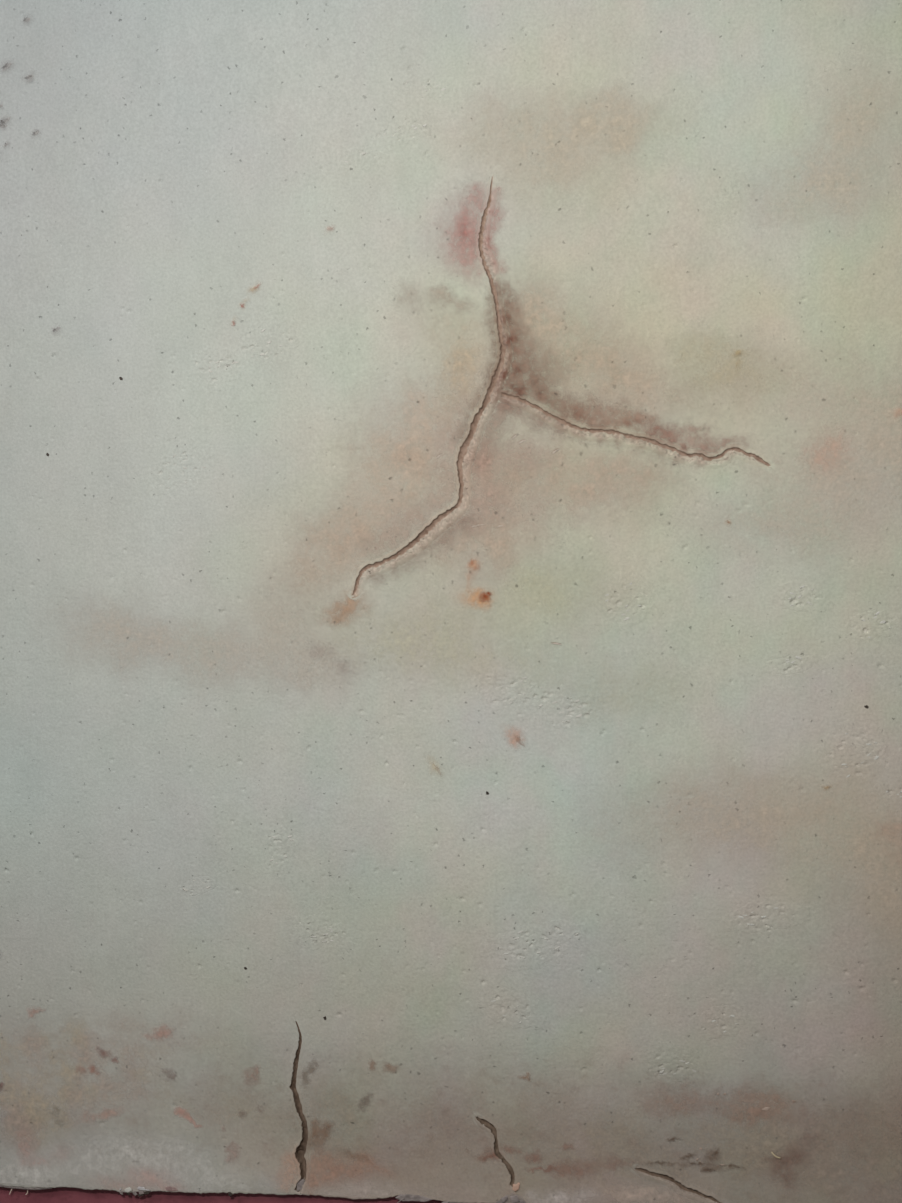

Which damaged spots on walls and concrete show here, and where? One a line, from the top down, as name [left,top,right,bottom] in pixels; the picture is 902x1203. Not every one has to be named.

crack [351,174,772,598]
leakage [472,285,730,514]
rust [471,590,491,606]
leakage [0,1138,245,1190]
crack [286,1019,312,1194]
crack [475,1114,519,1191]
leakage [310,1073,902,1203]
crack [632,1165,724,1203]